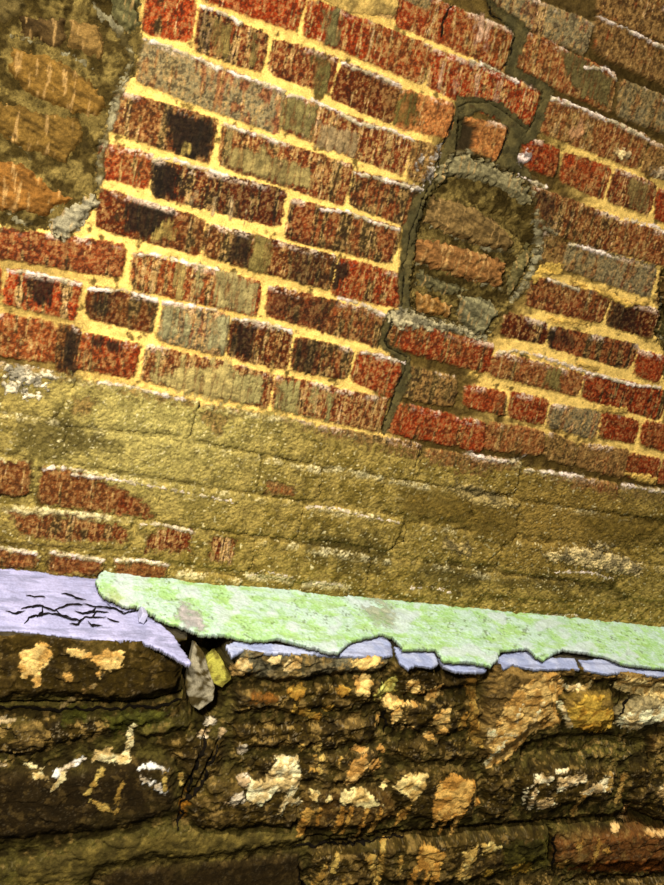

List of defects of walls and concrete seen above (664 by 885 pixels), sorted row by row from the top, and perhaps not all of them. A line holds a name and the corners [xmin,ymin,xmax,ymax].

crack [379,0,554,435]
spalling [410,148,558,342]
crack [7,593,138,626]
peeling [197,716,227,739]
peeling [229,657,253,677]
peeling [267,655,303,672]
peeling [287,655,444,729]
crack [176,735,218,830]